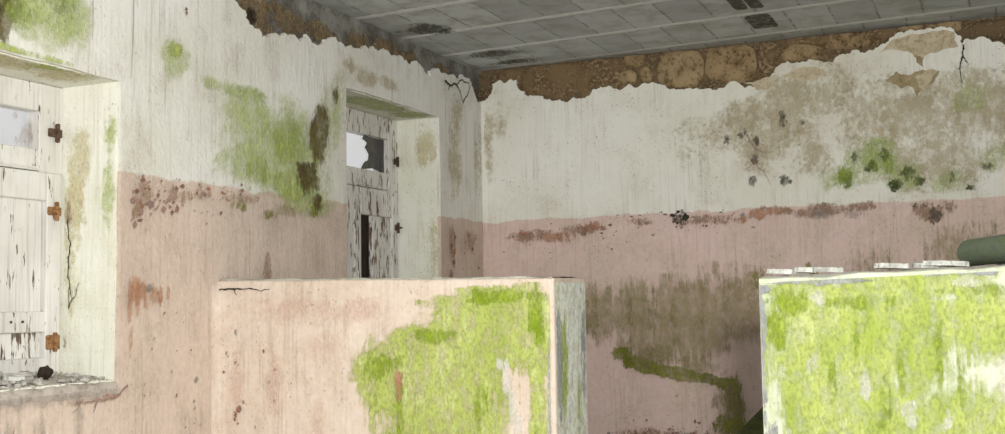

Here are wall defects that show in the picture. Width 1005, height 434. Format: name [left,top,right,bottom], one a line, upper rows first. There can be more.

water stain [707,69,853,171]
water stain [845,70,1005,189]
peeling [509,221,619,253]
peeling [630,209,755,236]
water stain [496,357,522,429]
water stain [548,254,875,434]